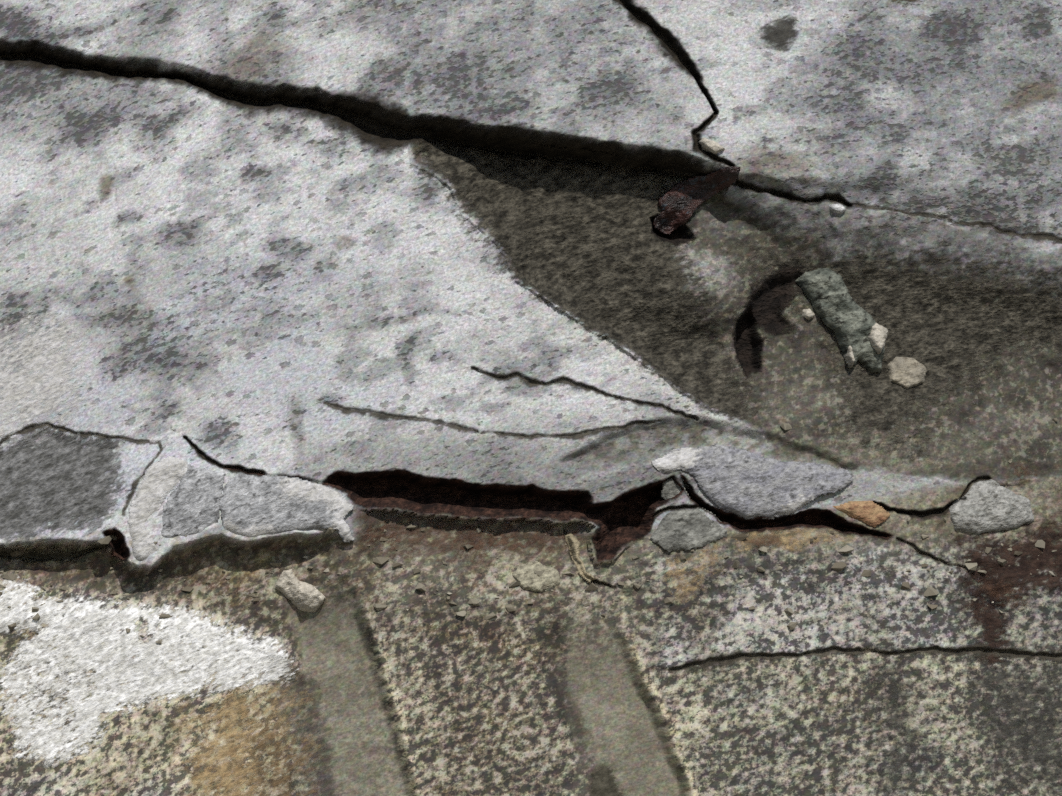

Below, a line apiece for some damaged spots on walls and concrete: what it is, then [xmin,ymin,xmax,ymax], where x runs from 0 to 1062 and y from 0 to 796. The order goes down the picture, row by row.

crack [0,0,1062,243]
crack [323,366,699,439]
spalling [0,424,355,561]
peeling [651,443,890,528]
leakage [0,580,299,765]
crack [669,643,1062,673]